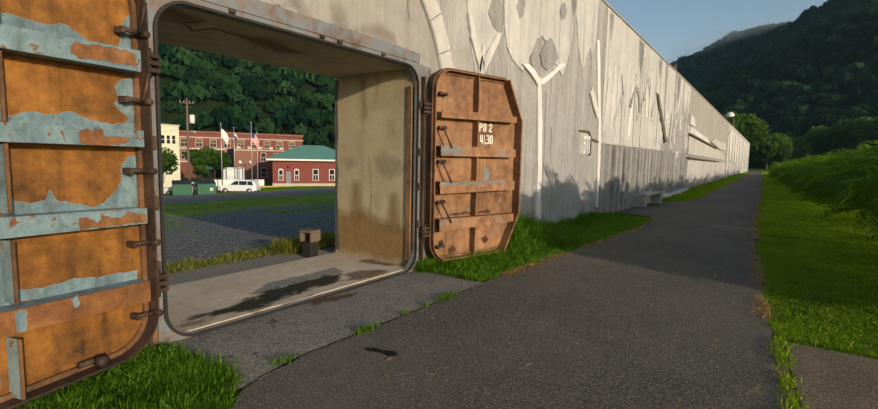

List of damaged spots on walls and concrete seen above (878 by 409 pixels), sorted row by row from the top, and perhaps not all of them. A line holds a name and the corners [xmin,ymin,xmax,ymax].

peeling [0,12,86,40]
peeling [118,15,131,49]
peeling [0,77,134,130]
peeling [4,155,138,215]
peeling [0,262,138,332]